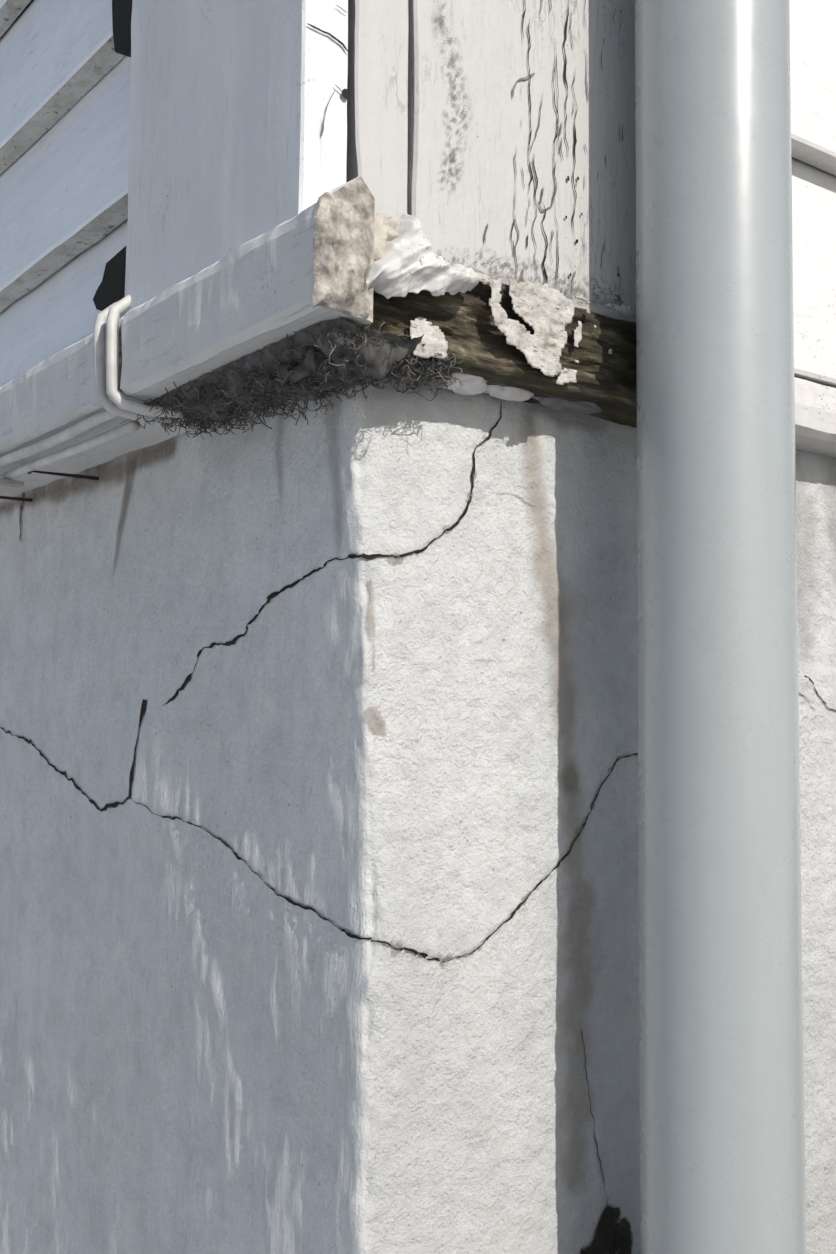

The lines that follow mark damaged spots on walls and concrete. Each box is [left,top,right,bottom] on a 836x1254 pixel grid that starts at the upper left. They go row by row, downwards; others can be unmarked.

water stain [438,5,467,184]
crack [484,0,623,315]
peeling [410,317,448,359]
peeling [475,272,596,385]
crack [0,403,638,969]
crack [798,671,836,711]
peeling [580,1205,633,1254]